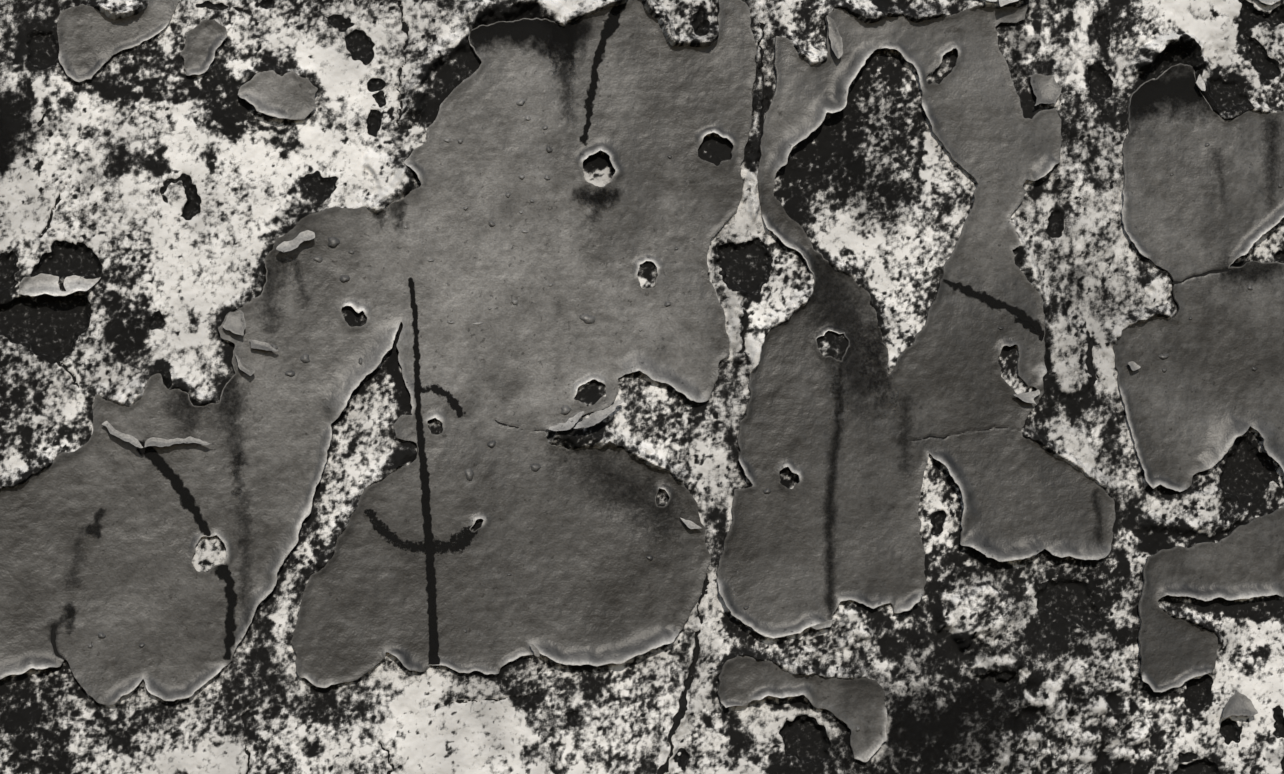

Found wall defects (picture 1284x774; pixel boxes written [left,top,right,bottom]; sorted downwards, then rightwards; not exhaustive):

leakage [469,3,626,146]
peeling [0,0,818,774]
peeling [681,0,1284,774]
leakage [416,421,440,665]
crack [657,573,709,774]